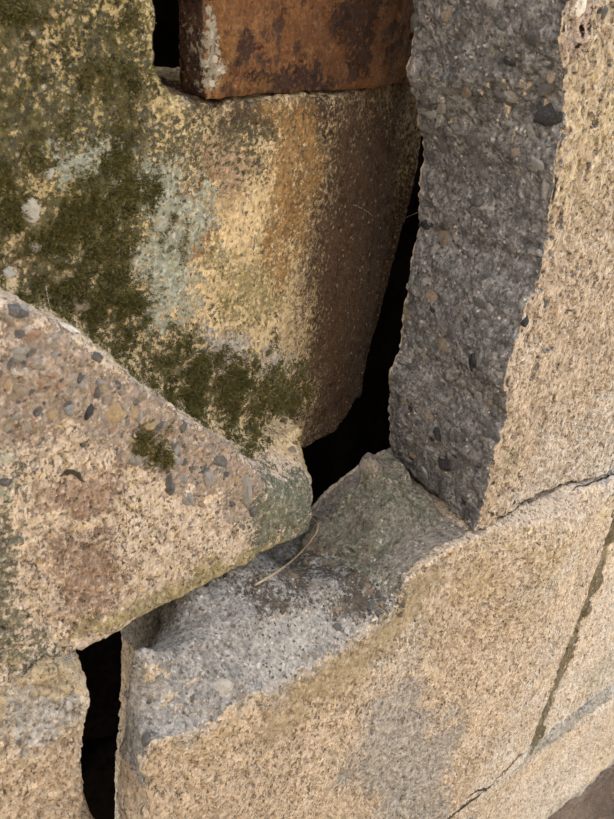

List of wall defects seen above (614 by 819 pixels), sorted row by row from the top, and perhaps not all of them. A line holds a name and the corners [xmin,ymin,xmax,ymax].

corrosion [154,0,420,448]
water stain [197,321,303,385]
crack [448,754,522,819]